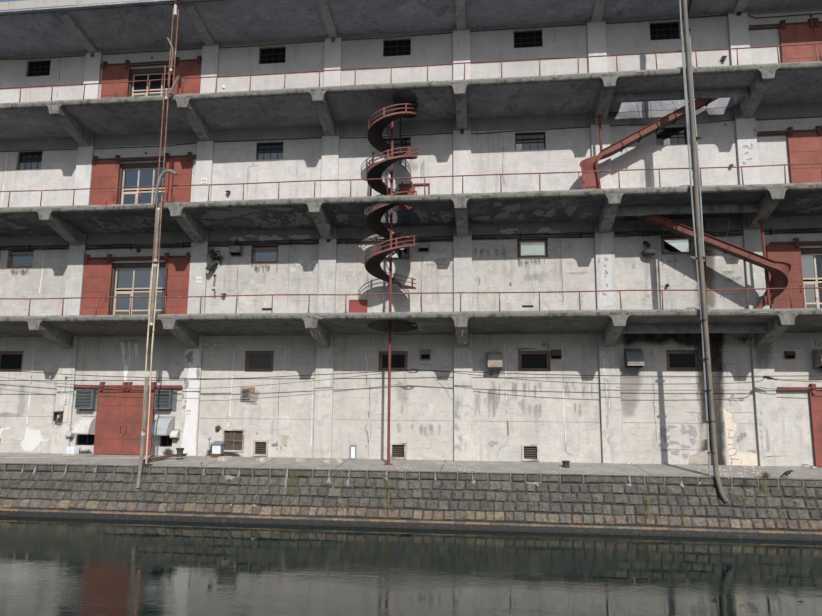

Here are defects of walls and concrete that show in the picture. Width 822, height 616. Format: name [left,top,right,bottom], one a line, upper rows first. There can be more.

damp [623,333,724,465]
peeling [658,424,713,475]
peeling [720,408,768,479]